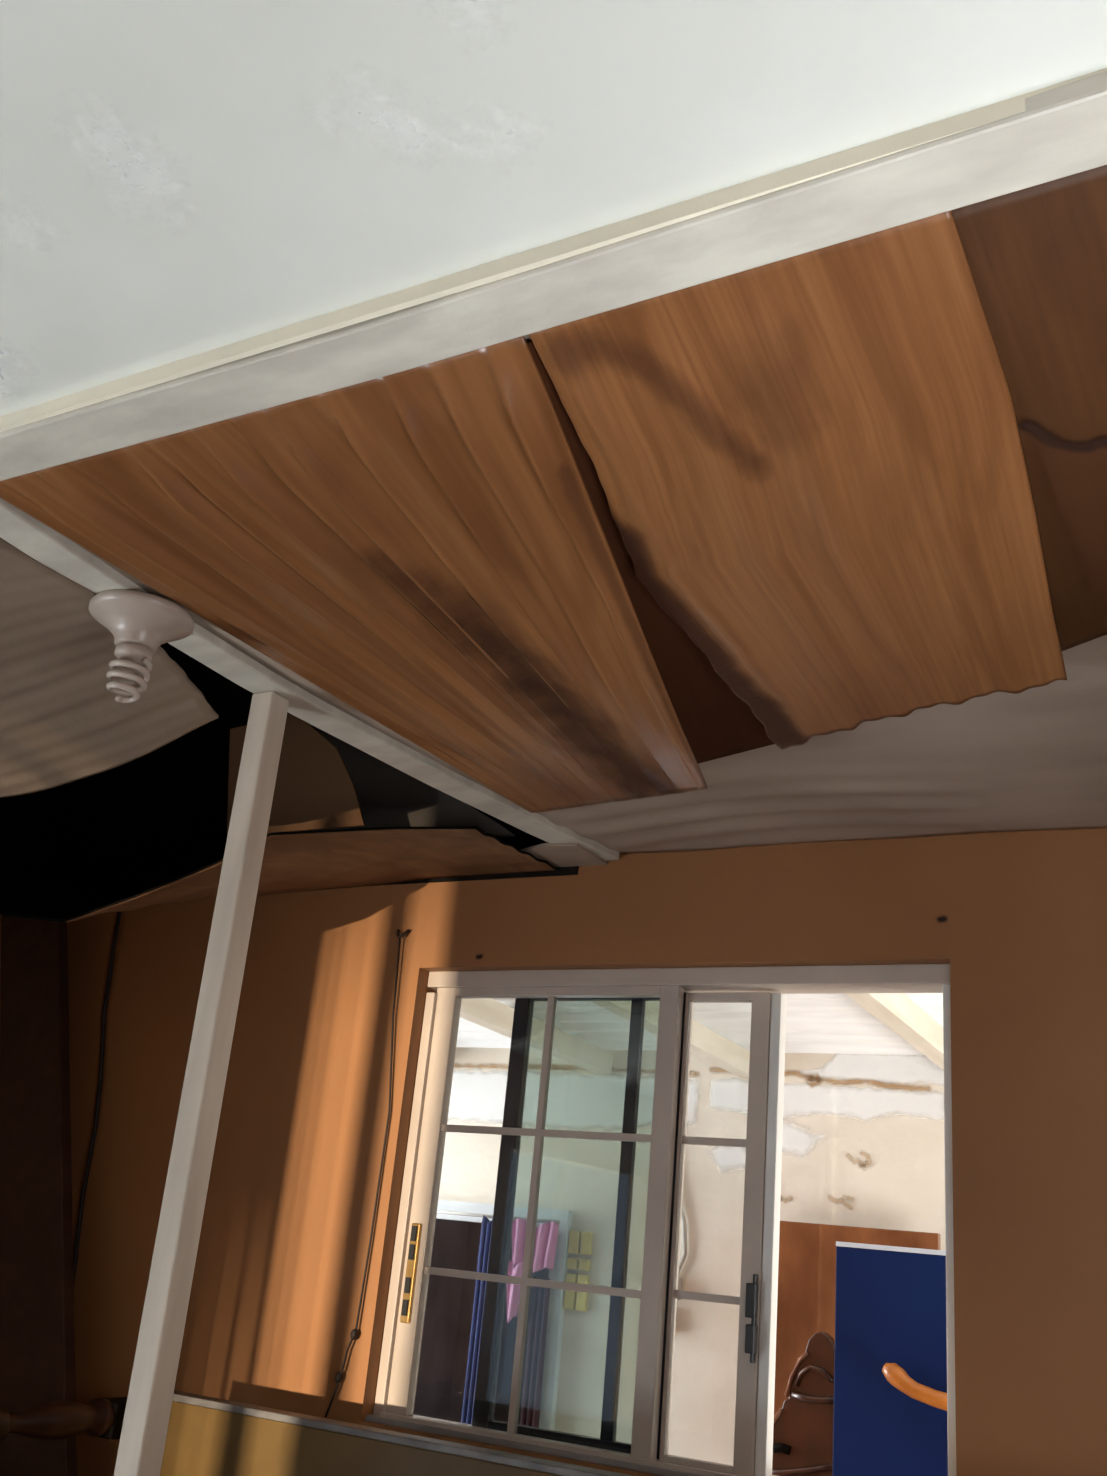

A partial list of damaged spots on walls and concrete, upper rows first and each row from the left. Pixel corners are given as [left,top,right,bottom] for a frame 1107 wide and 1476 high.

damp [431,605,671,796]
damp [615,524,805,749]